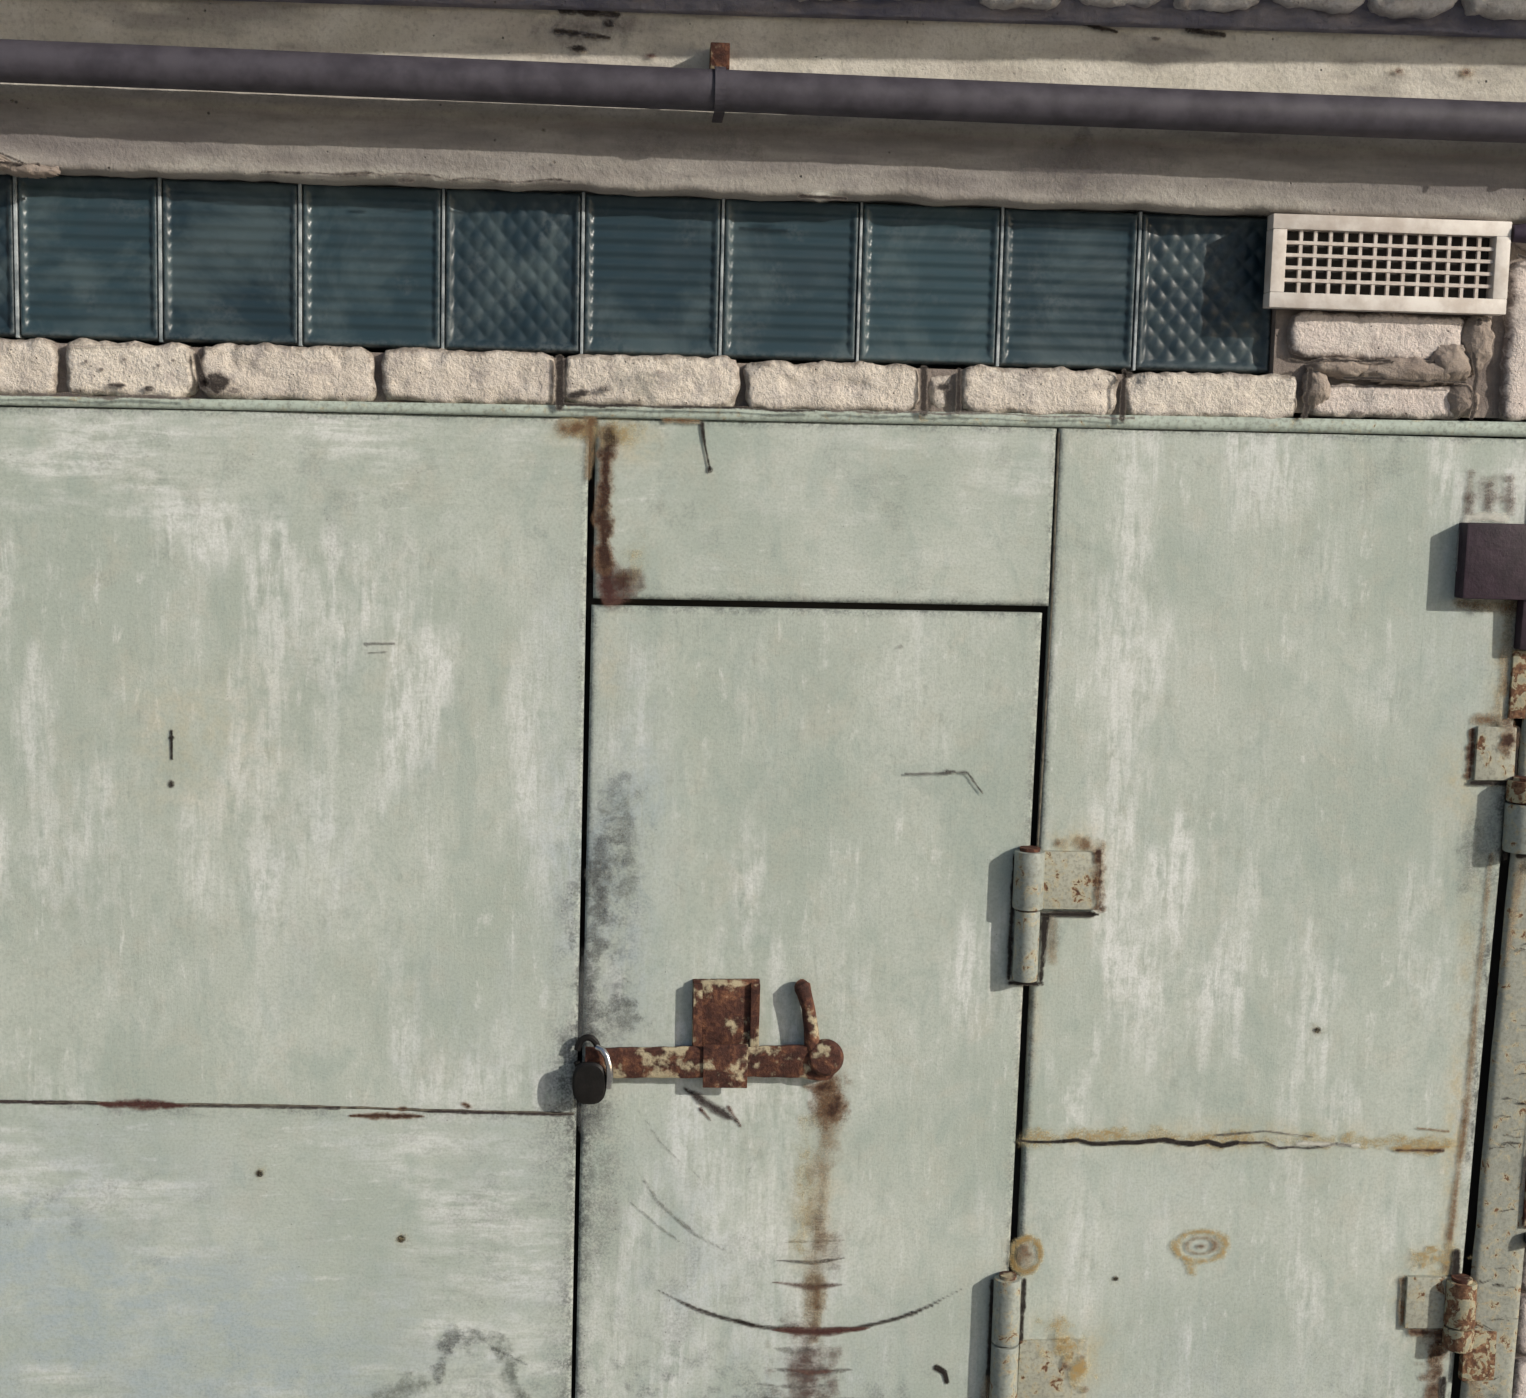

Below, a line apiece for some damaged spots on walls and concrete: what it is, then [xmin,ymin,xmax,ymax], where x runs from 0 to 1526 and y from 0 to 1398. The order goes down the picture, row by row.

corrosion [559,416,597,478]
corrosion [1465,658,1518,786]
crack [1019,1128,1451,1155]
corrosion [1413,855,1493,1276]
crack [1489,1025,1526,1211]
corrosion [788,1076,847,1398]
corrosion [1040,1317,1097,1392]
corrosion [1399,1277,1448,1398]